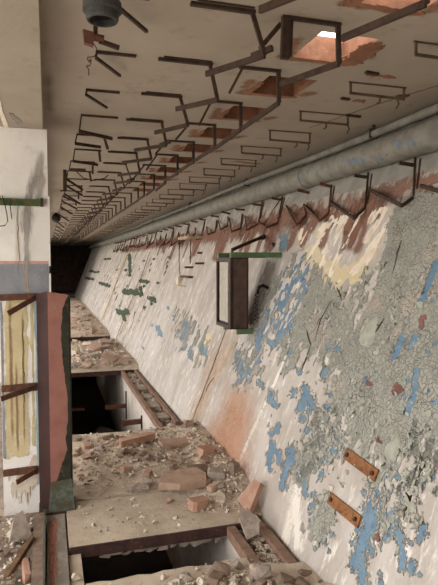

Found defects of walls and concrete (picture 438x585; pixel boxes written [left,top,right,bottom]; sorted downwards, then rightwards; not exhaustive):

spalling [347,0,402,12]
spalling [340,42,386,66]
water stain [27,155,44,199]
rust [123,172,438,261]
peeling [85,254,159,324]
peeling [0,261,49,503]
peeling [230,182,438,585]